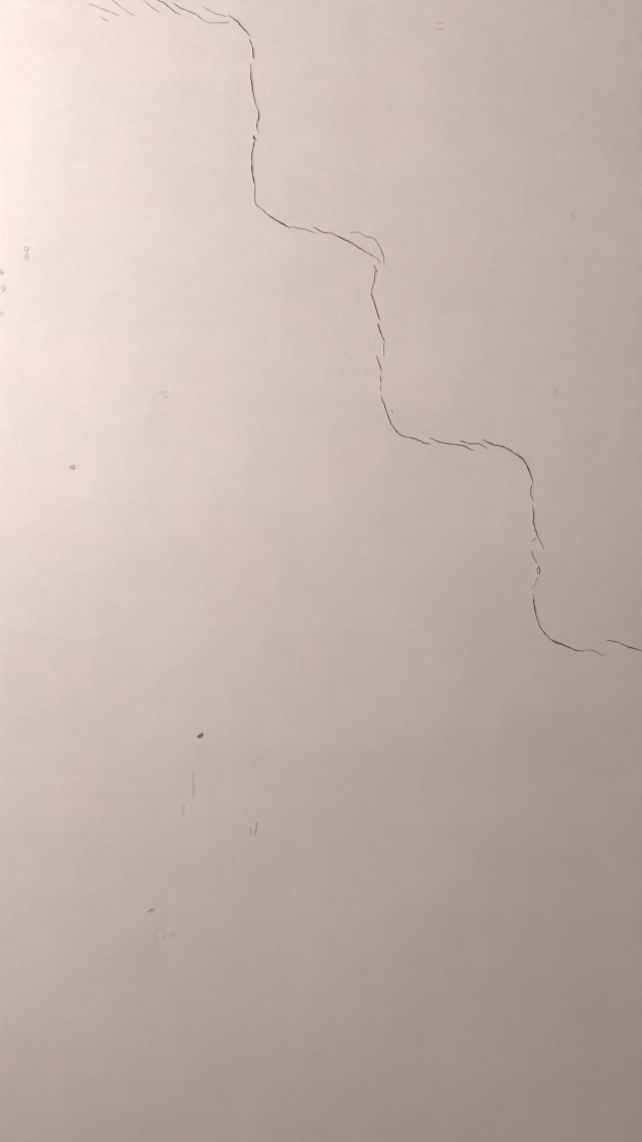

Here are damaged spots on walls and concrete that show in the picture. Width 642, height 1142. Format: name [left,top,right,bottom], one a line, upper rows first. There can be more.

crack [88,0,642,656]